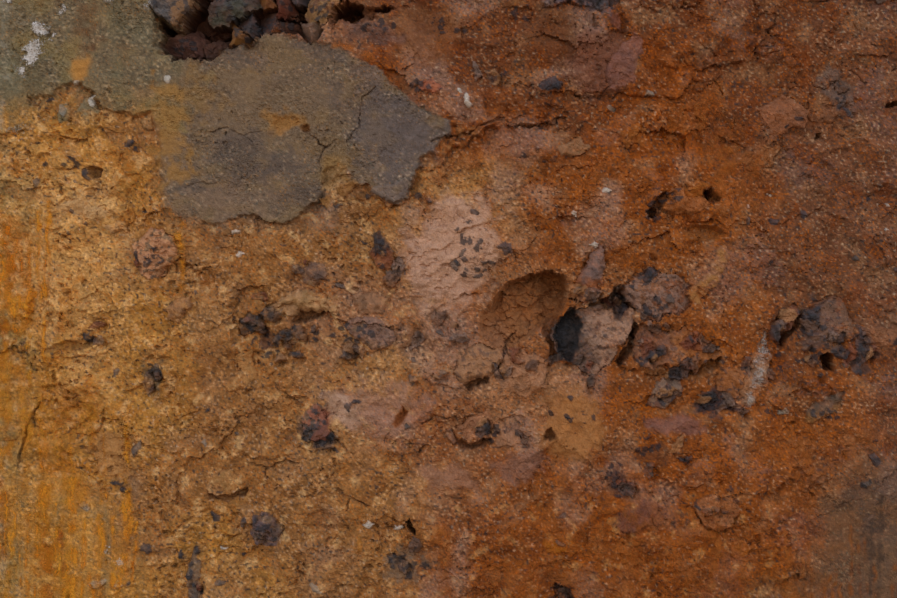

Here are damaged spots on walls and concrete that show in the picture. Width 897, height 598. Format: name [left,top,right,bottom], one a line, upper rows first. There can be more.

corrosion [0,200,52,333]
corrosion [0,444,95,598]
corrosion [97,487,138,590]
spalling [0,83,443,598]
spalling [313,0,897,505]
spalling [393,180,844,598]